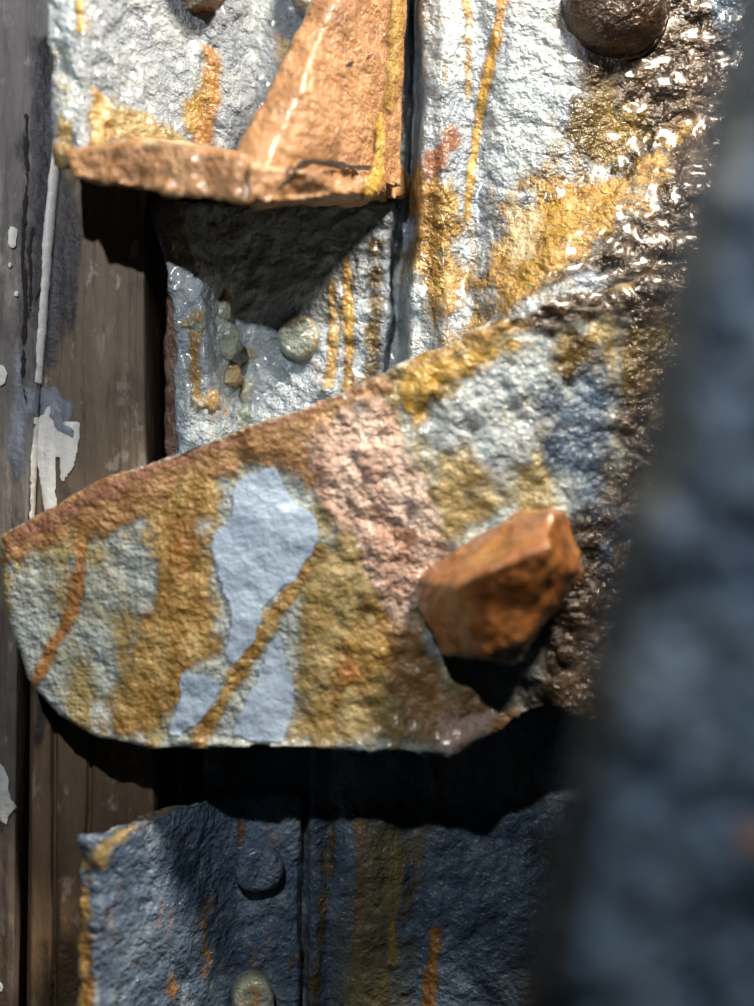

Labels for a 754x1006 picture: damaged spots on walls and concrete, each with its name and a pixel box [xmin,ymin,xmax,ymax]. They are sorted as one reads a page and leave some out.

rust [1,0,726,757]
rust [82,805,179,869]
rust [317,805,339,943]
rust [48,880,94,1006]
rust [421,928,441,1006]